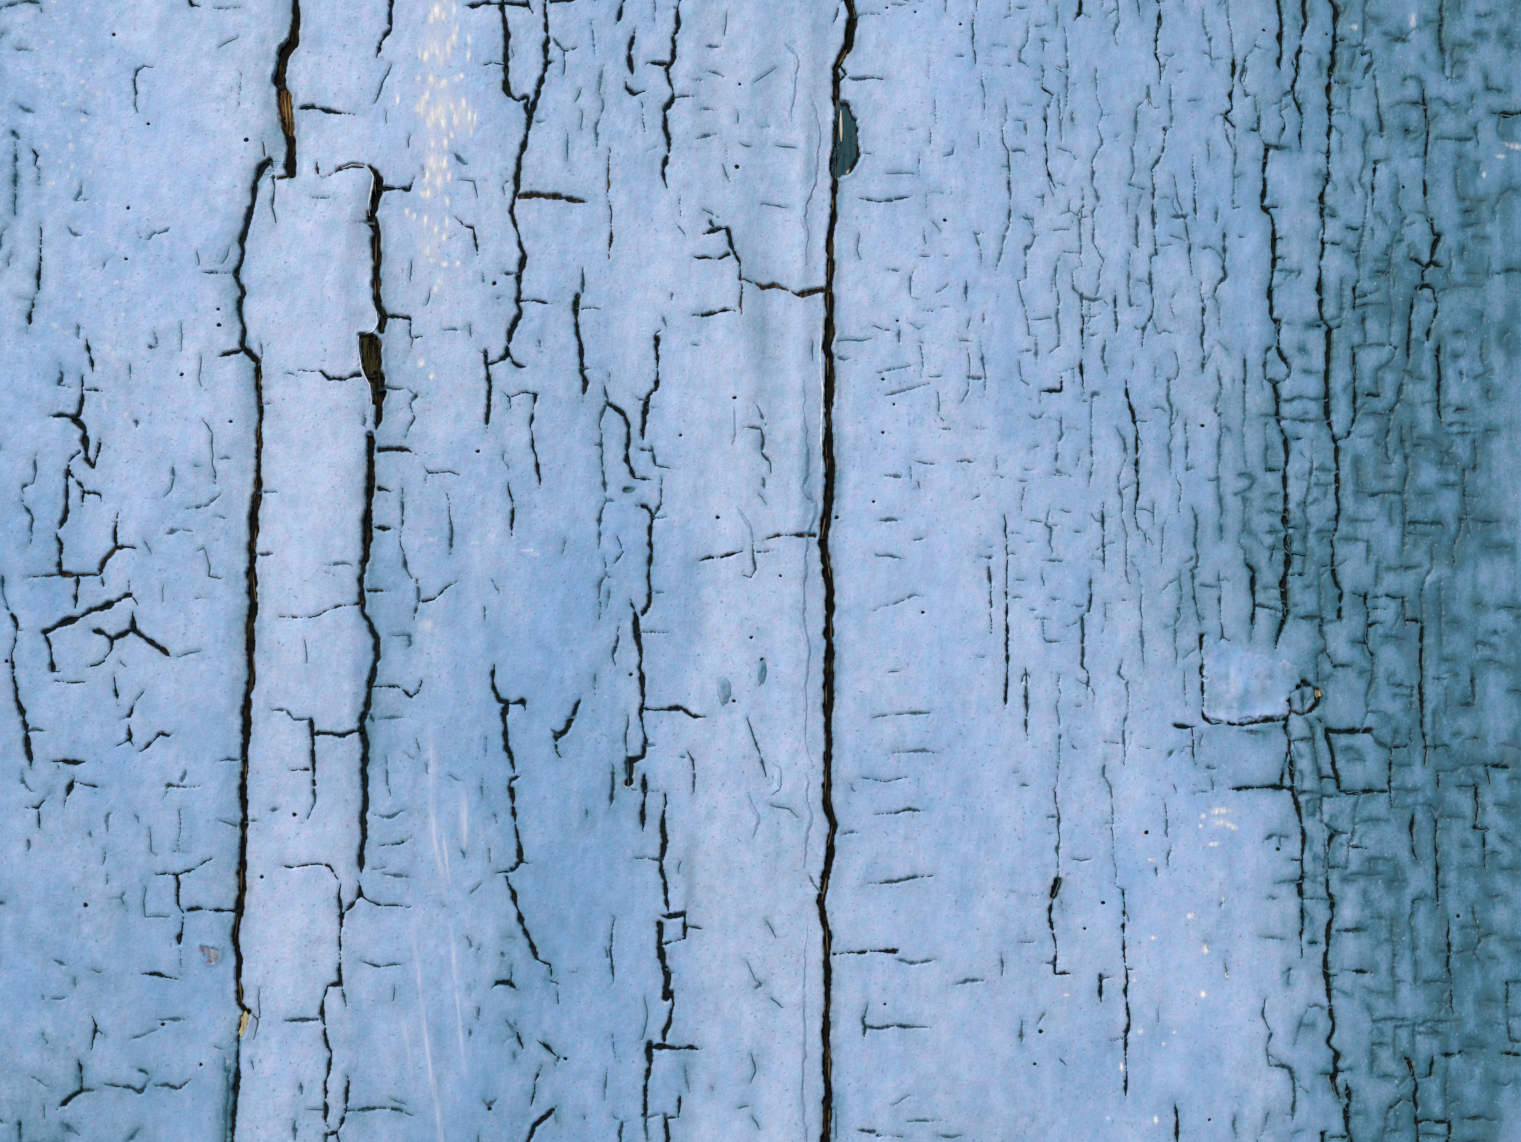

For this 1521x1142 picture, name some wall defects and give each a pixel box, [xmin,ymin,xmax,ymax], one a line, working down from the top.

crack [0,105,108,334]
peeling [831,100,860,179]
crack [1,324,230,852]
crack [89,0,713,1142]
crack [615,0,1521,1142]
peeling [1201,638,1321,725]
crack [0,960,191,1141]